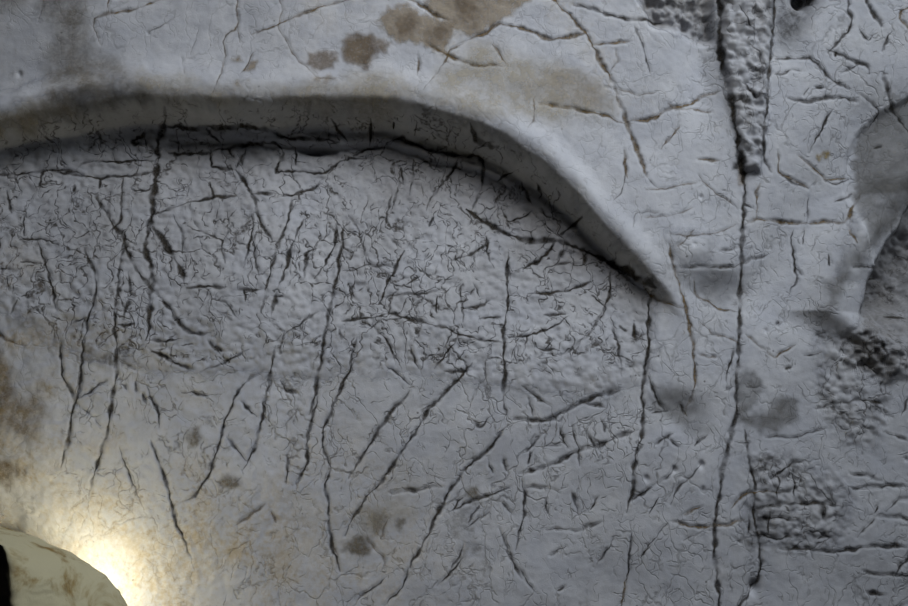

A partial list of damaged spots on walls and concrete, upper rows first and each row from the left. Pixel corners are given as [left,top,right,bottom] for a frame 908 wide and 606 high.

leakage [309,0,528,69]
crack [418,0,656,79]
crack [716,0,751,70]
crack [0,120,566,564]
crack [386,84,908,606]